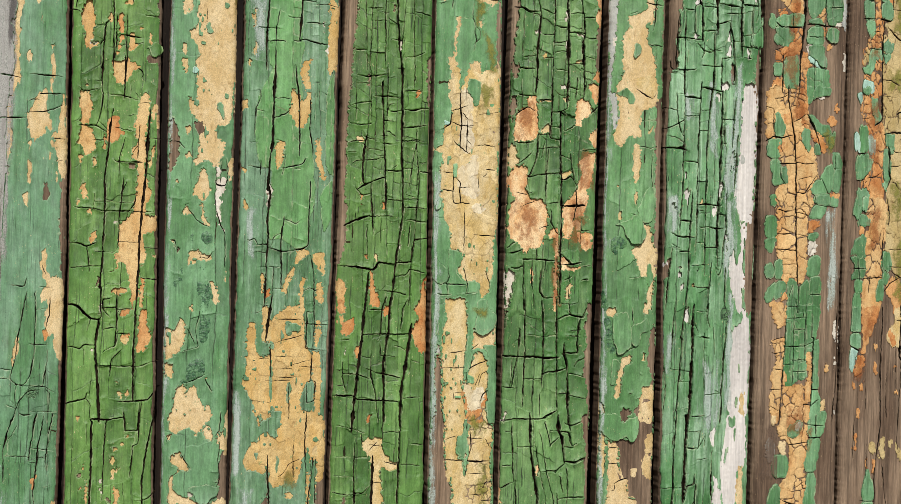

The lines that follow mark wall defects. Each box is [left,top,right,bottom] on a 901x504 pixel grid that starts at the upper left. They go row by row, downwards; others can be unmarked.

crack [0,3,183,504]
peeling [27,0,249,361]
peeling [163,318,186,378]
peeling [166,382,228,504]
crack [182,164,229,274]
peeling [242,249,325,504]
peeling [289,59,313,128]
peeling [323,0,364,265]
peeling [335,278,355,336]
crack [251,0,596,504]
peeling [411,0,693,504]
crack [637,0,901,504]